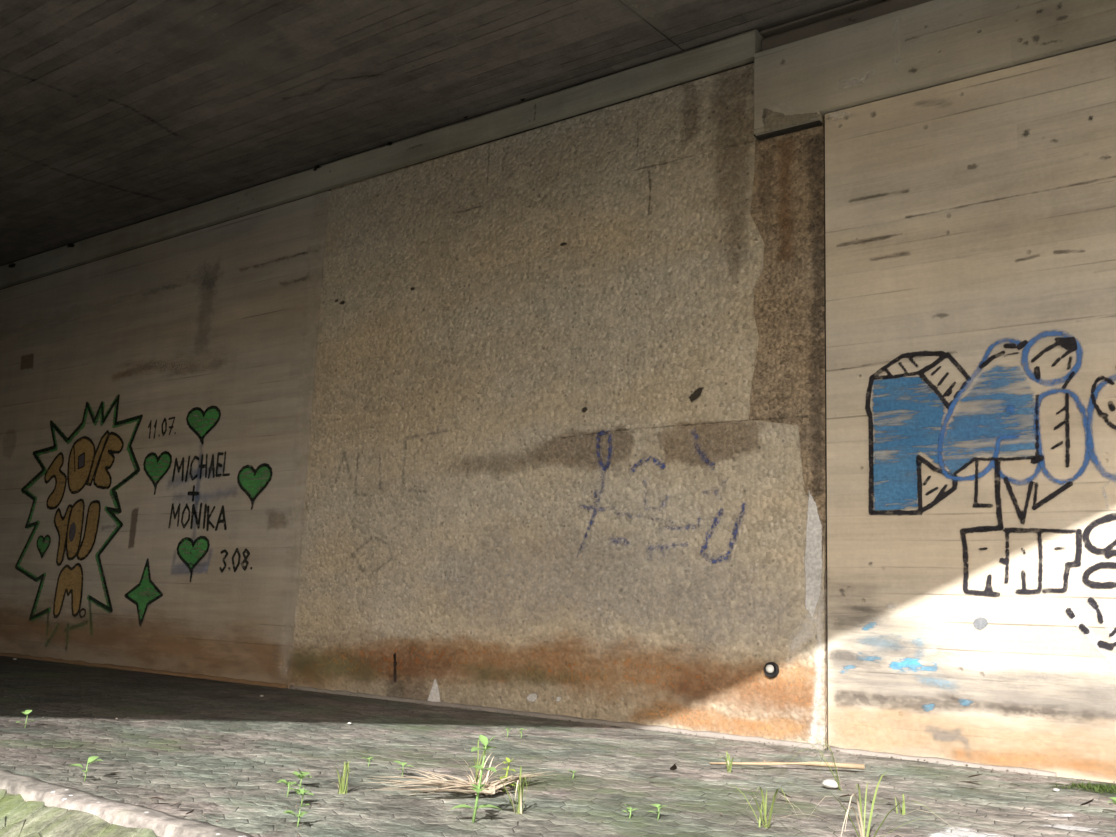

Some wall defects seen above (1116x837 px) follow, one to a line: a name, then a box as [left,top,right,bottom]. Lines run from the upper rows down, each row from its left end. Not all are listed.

damp [974,617,988,630]
rust [293,643,818,706]
rust [640,705,801,735]